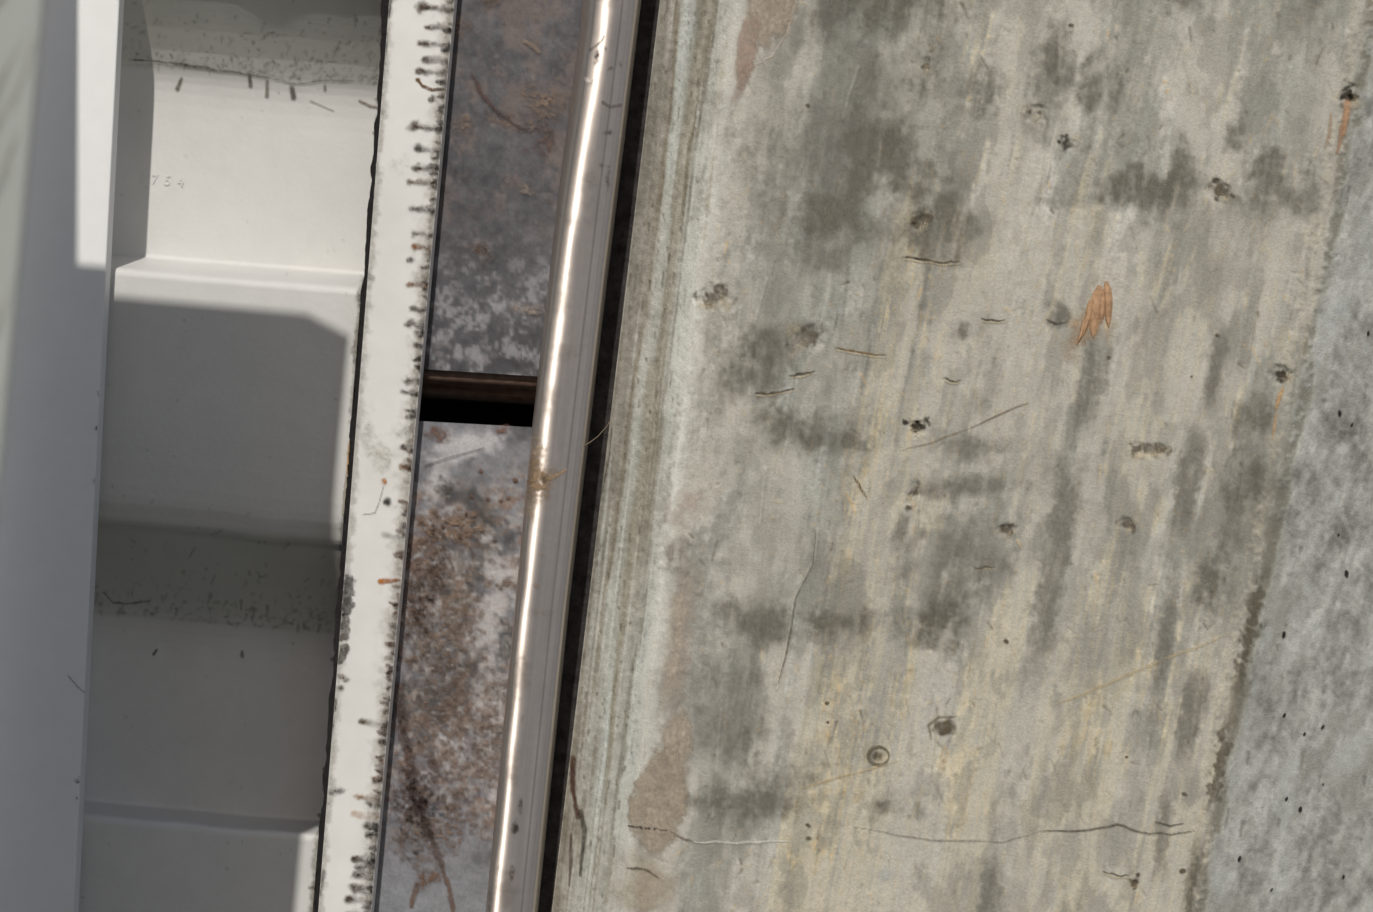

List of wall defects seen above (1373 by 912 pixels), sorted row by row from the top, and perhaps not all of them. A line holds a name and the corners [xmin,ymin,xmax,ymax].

damp [1045,36,1101,109]
damp [796,104,970,266]
damp [1099,150,1190,207]
damp [1206,343,1223,394]
damp [1175,437,1203,517]
damp [1038,489,1077,641]
damp [1235,589,1265,675]
corrosion [378,446,566,912]
damp [1179,689,1206,749]
damp [1207,728,1232,798]
crack [1047,822,1190,835]
damp [1187,858,1198,912]